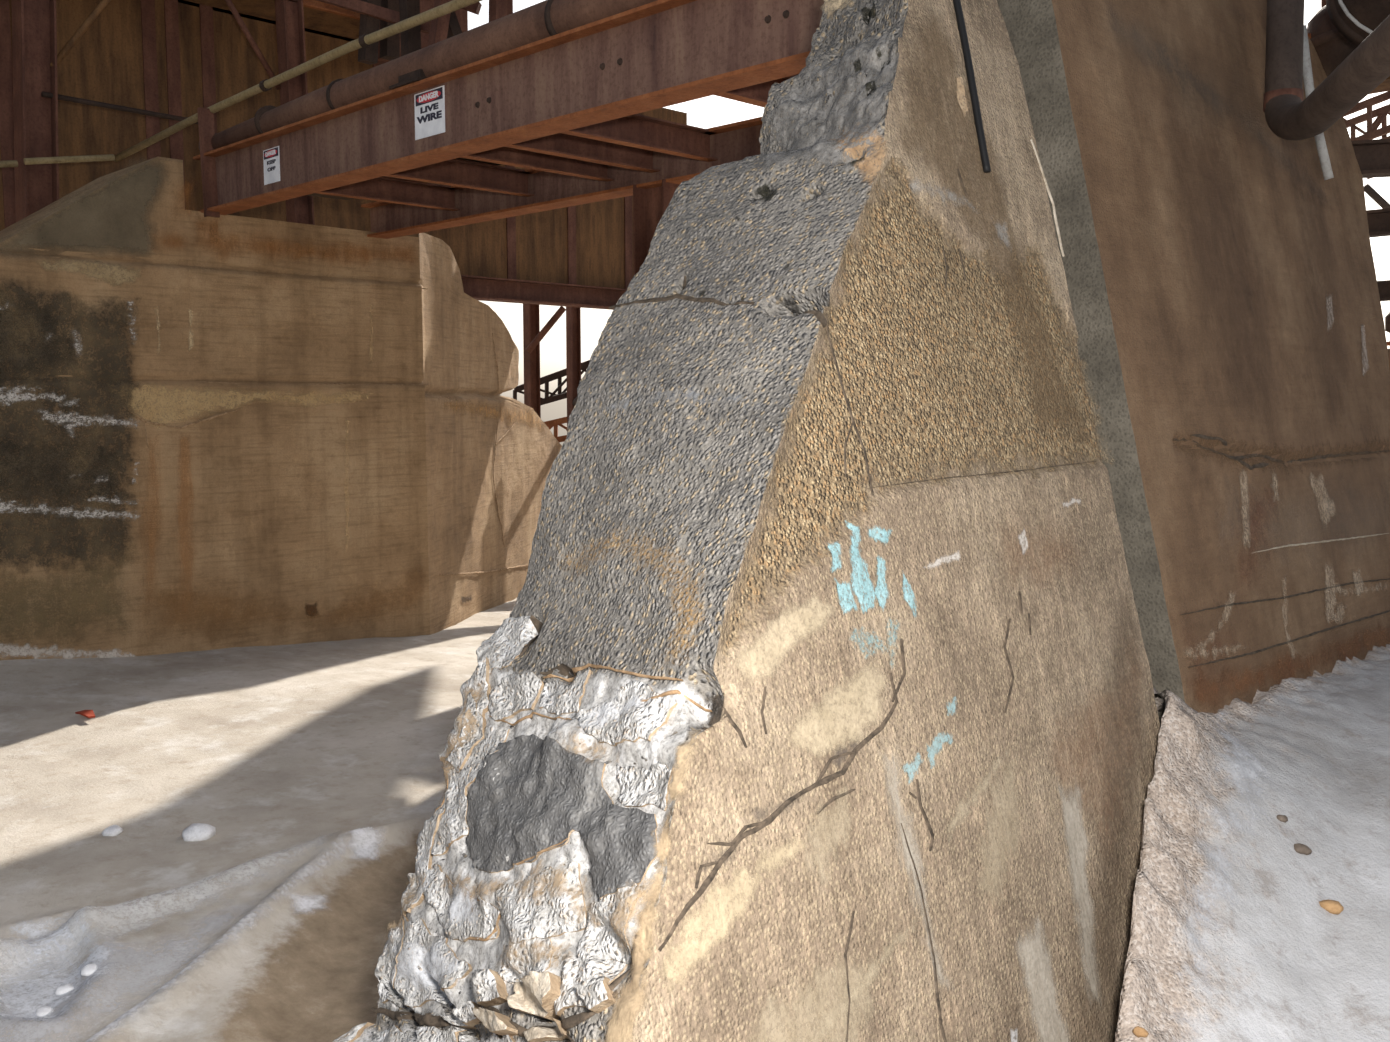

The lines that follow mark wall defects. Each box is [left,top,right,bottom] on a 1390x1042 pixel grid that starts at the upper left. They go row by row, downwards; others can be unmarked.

water stain [0,279,139,659]
crack [609,276,1095,496]
spalling [333,615,724,1042]
crack [370,639,906,1042]
crack [899,779,947,1042]